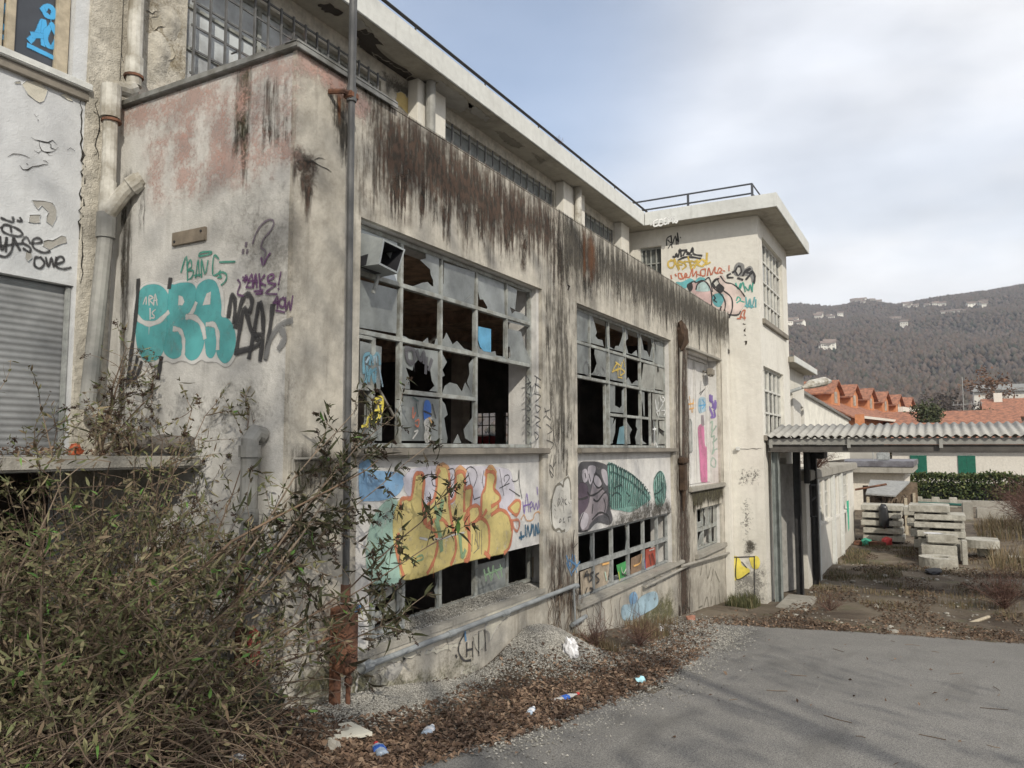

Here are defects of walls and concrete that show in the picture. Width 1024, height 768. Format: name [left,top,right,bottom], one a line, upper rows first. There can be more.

peeling [14,80,48,103]
water stain [232,66,251,172]
water stain [266,79,277,138]
water stain [331,88,348,151]
crack [8,100,101,284]
water stain [293,148,316,213]
peeling [25,200,67,262]
water stain [363,72,729,621]